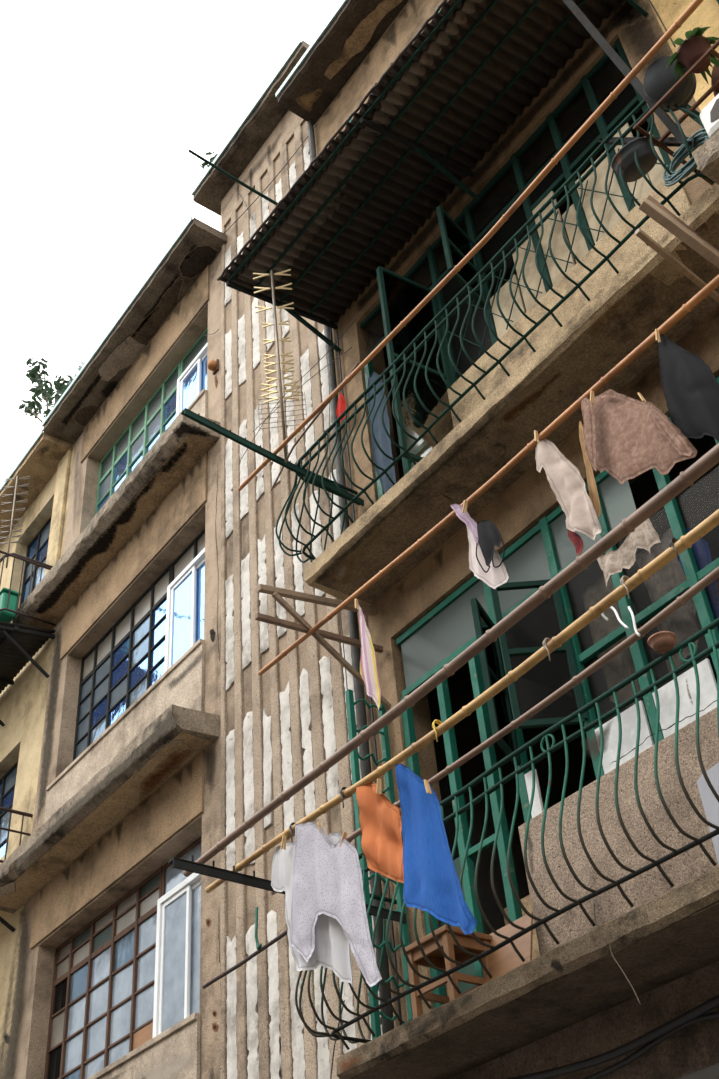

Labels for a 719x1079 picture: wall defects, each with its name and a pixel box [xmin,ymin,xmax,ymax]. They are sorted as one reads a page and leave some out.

peeling [324,0,403,80]